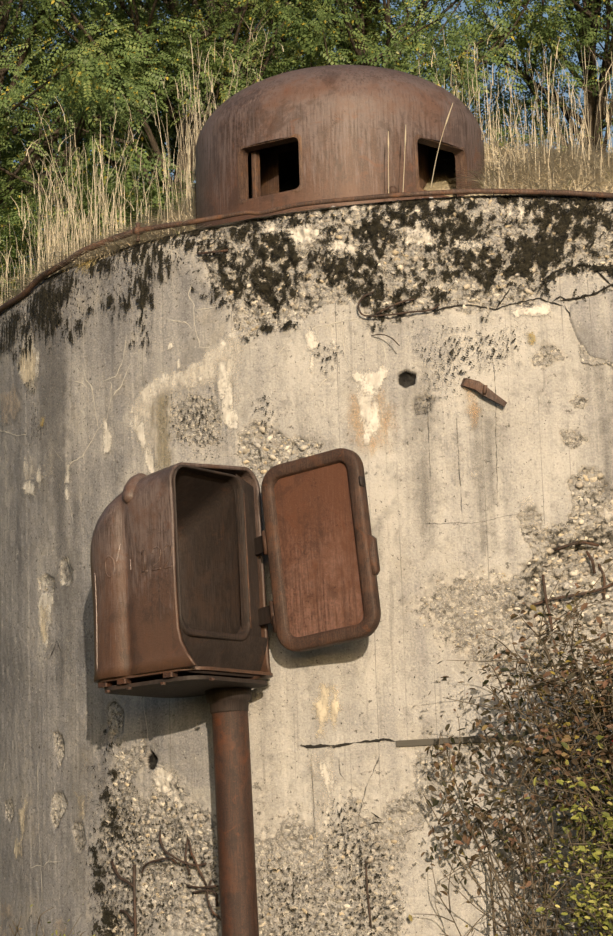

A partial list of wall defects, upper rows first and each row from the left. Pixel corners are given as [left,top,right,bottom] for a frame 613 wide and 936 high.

spalling [197,196,613,336]
crack [431,264,613,320]
water stain [17,331,40,392]
water stain [129,328,246,473]
spalling [237,420,324,478]
spalling [399,371,416,388]
spalling [414,393,435,415]
spalling [533,346,564,366]
spalling [410,468,613,723]
spalling [98,738,221,936]
crack [300,738,396,843]
spalling [254,744,480,936]